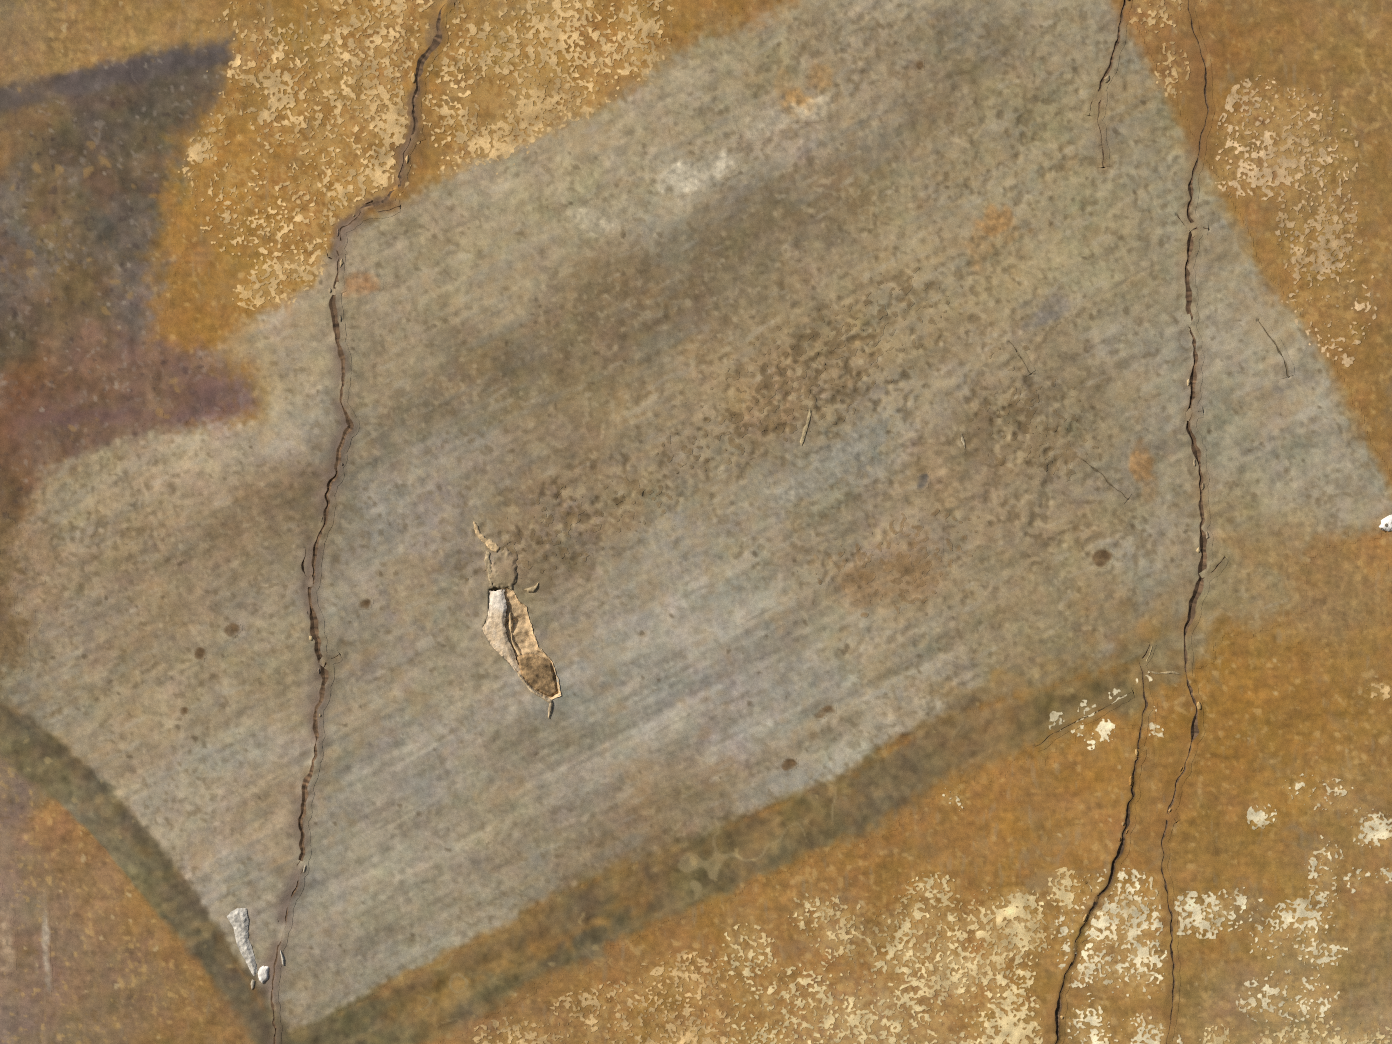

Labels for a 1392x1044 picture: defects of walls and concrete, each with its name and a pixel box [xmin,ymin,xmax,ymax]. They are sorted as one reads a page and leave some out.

peeling [178,0,676,310]
efflorescence [565,194,638,238]
efflorescence [650,85,839,199]
peeling [1212,75,1377,367]
crack [265,0,456,1044]
spalling [465,476,681,718]
water stain [762,412,901,508]
peeling [1049,671,1153,750]
crack [1034,0,1229,1044]
water stain [1244,516,1392,663]
water stain [0,884,18,982]
peeling [472,773,1392,1044]